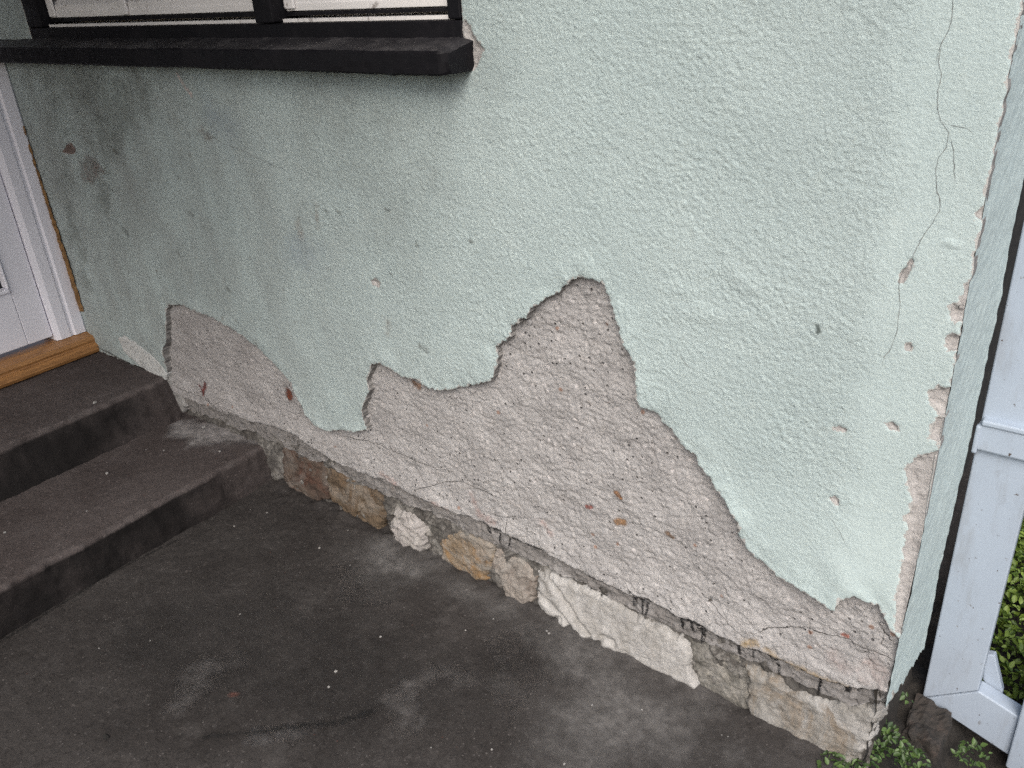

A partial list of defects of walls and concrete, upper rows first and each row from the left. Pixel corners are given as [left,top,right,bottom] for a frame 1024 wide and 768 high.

crack [876,6,974,358]
flaking render [950,282,970,321]
flaking render [945,334,961,350]
flaking render [169,277,951,706]
crack [702,594,897,665]